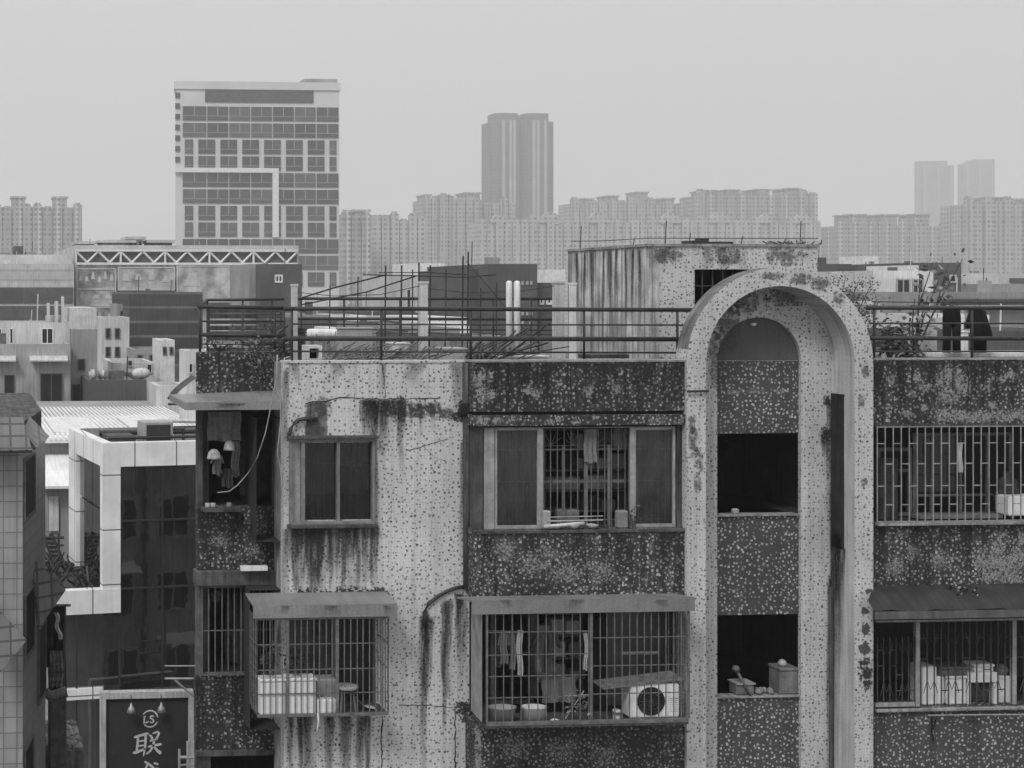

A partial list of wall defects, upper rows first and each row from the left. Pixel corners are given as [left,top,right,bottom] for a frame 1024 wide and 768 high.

water stain [575,250,641,308]
water stain [874,362,1019,385]
water stain [360,397,463,435]
water stain [285,528,390,595]
water stain [828,494,845,602]
water stain [420,594,465,687]